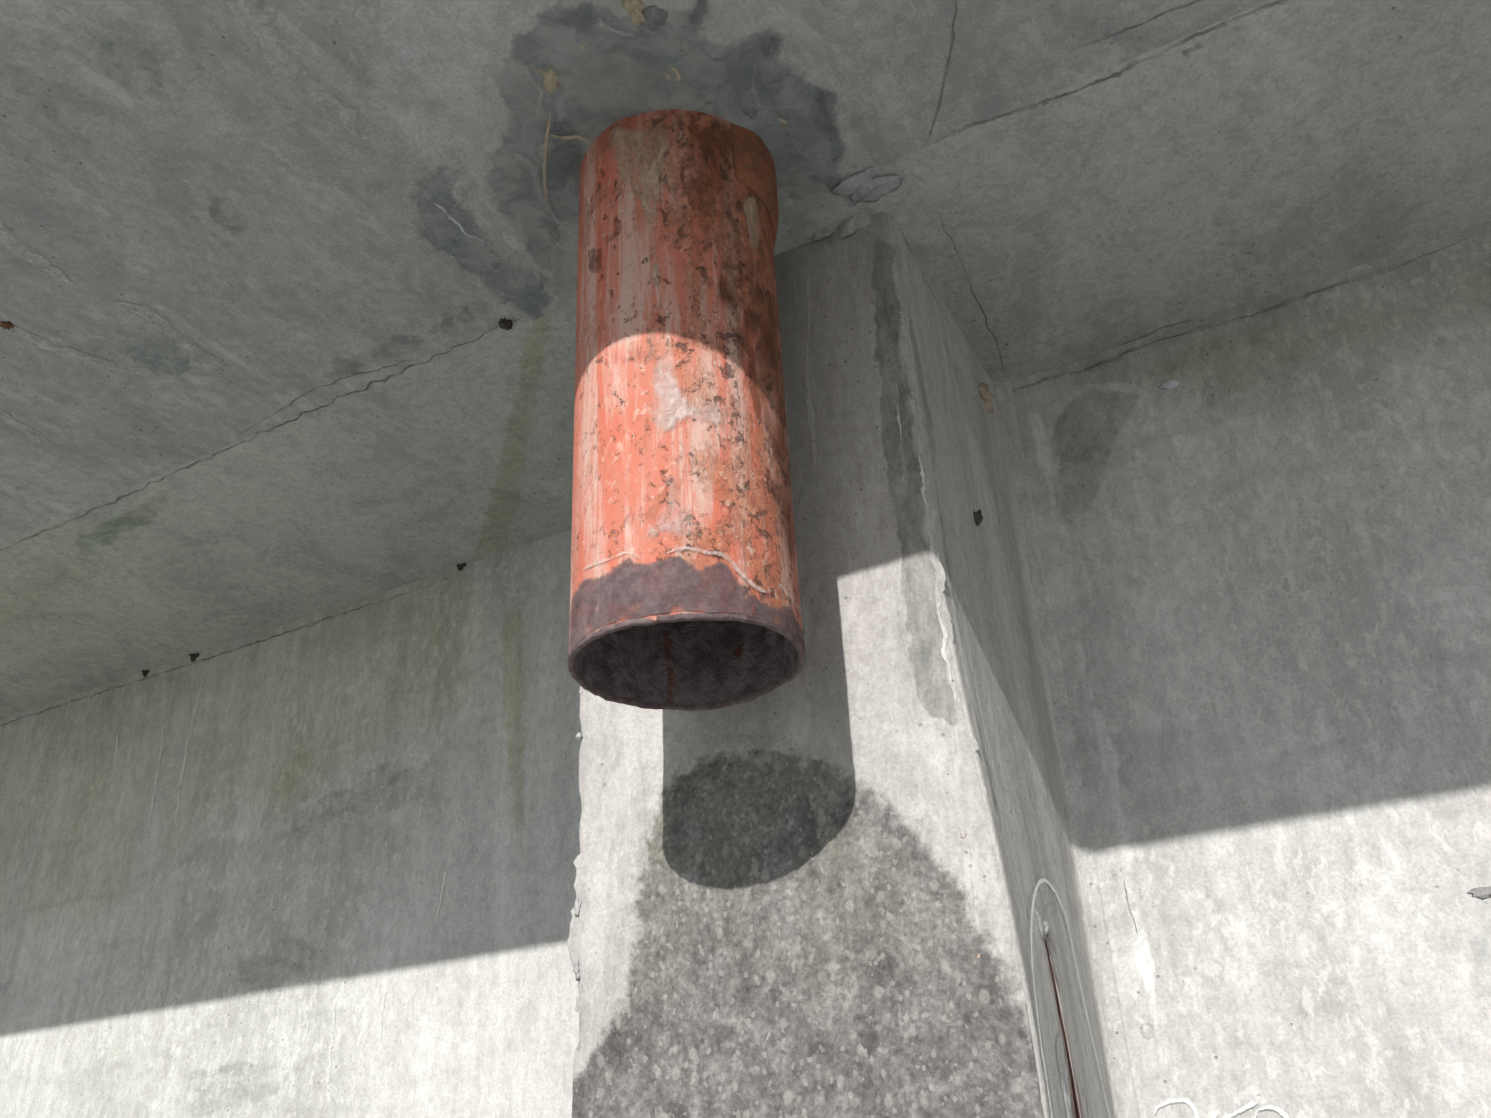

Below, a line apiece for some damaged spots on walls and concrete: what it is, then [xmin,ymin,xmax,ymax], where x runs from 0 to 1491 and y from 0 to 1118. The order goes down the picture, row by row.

crack [950,0,958,47]
crack [281,341,474,426]
crack [1036,910,1090,1118]